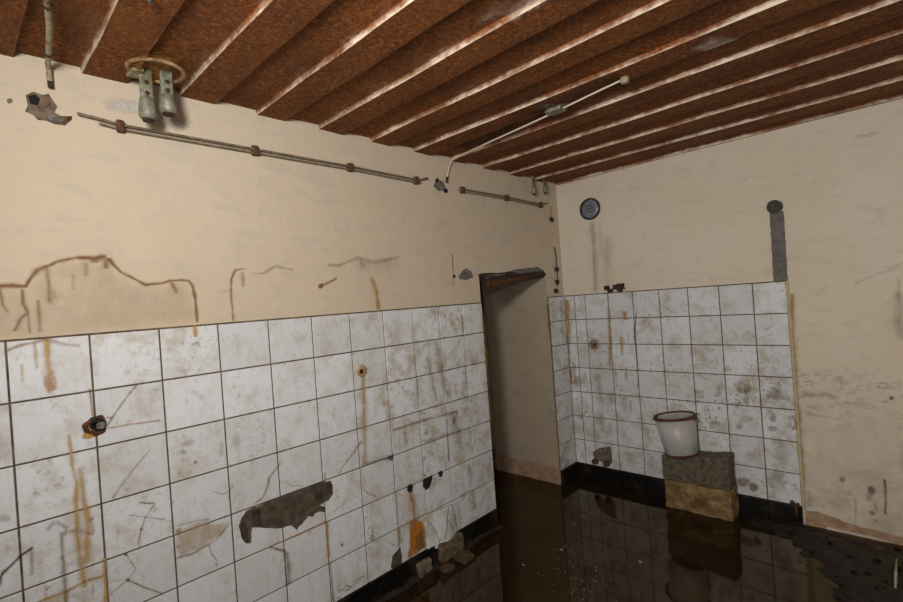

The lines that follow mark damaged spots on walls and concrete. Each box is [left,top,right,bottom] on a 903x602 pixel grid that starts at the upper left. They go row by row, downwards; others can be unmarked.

spalling [25,92,72,126]
water stain [0,255,198,329]
crack [0,547,33,582]
rust [74,480,89,527]
rust [64,533,108,602]
crack [119,502,160,593]
spalling [239,481,333,543]
spalling [391,547,402,568]
rust [398,492,426,557]